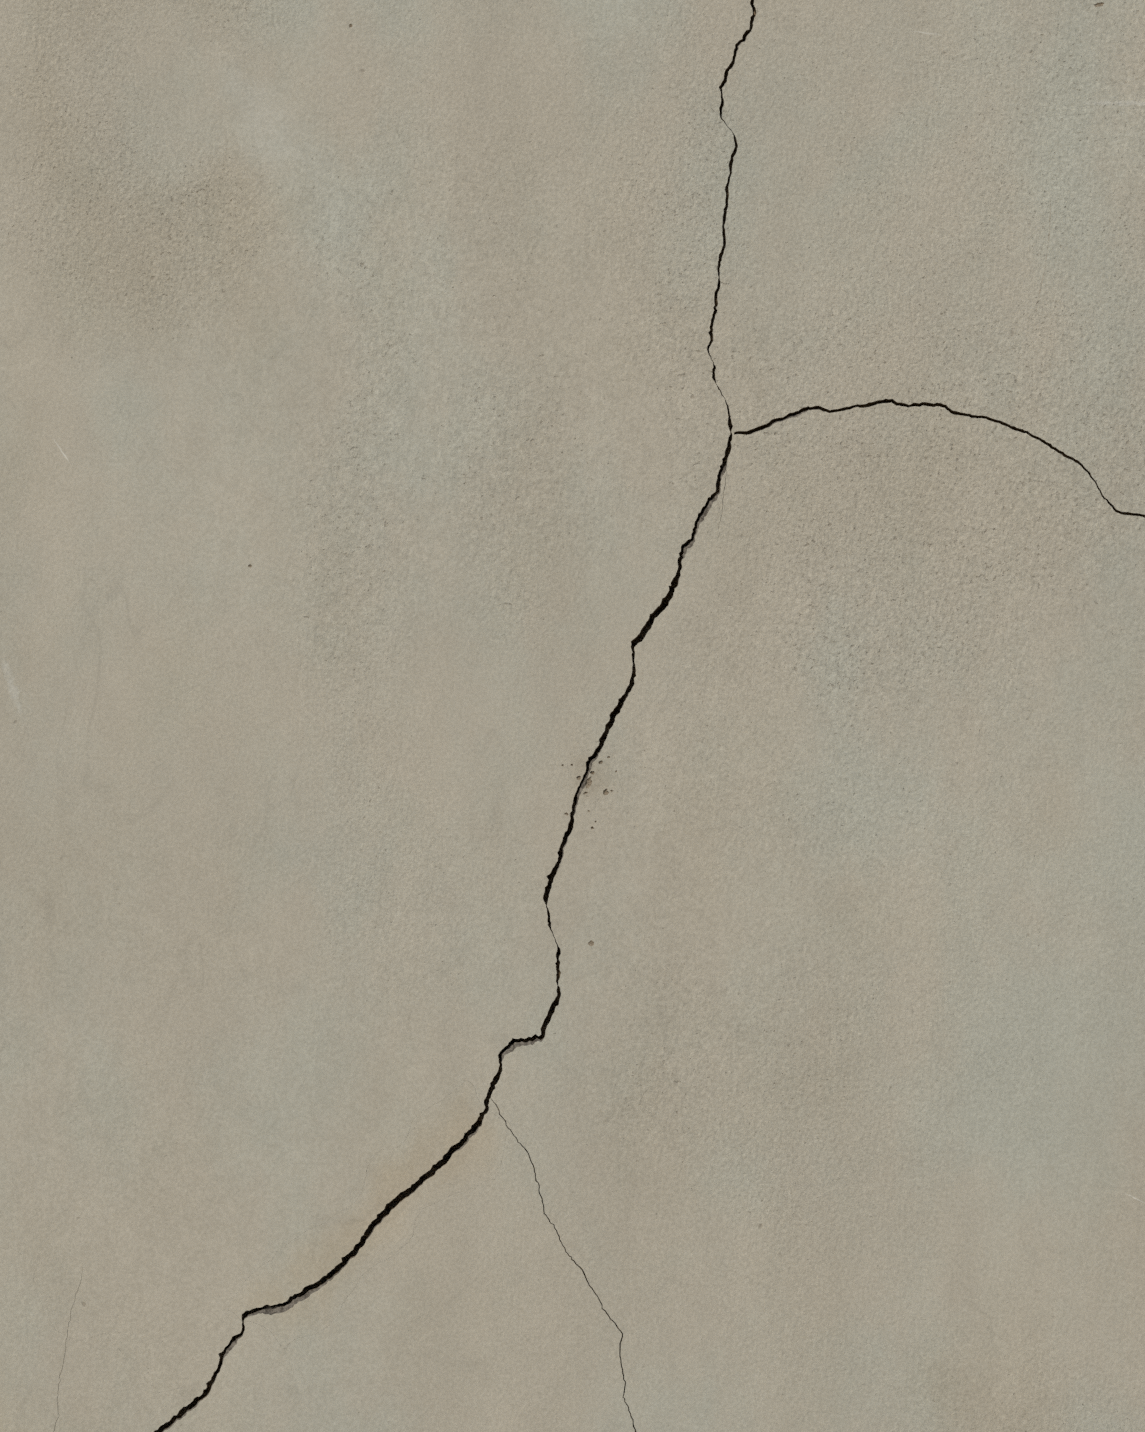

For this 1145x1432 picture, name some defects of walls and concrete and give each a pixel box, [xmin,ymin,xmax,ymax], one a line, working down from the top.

crack [154,0,756,1432]
crack [734,399,1145,518]